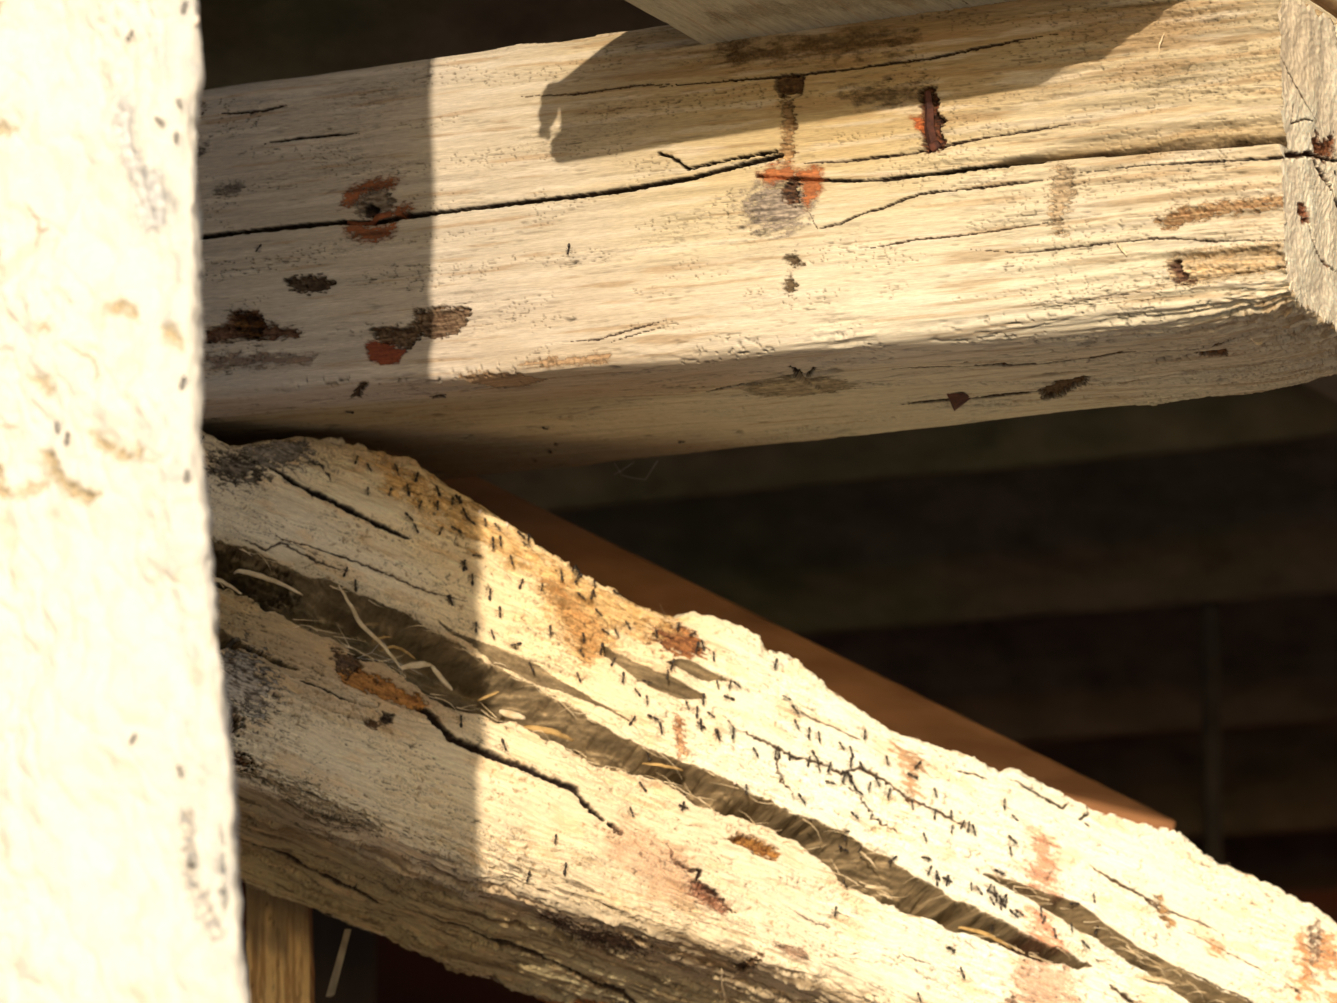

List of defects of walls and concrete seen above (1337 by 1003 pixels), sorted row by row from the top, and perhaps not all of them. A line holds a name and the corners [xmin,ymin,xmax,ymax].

rust [340,174,415,243]
crack [201,59,1337,240]
rust [759,162,825,206]
rust [911,117,925,133]
crack [870,207,1336,277]
rust [365,341,407,365]
crack [268,460,409,540]
crack [211,531,1320,1003]